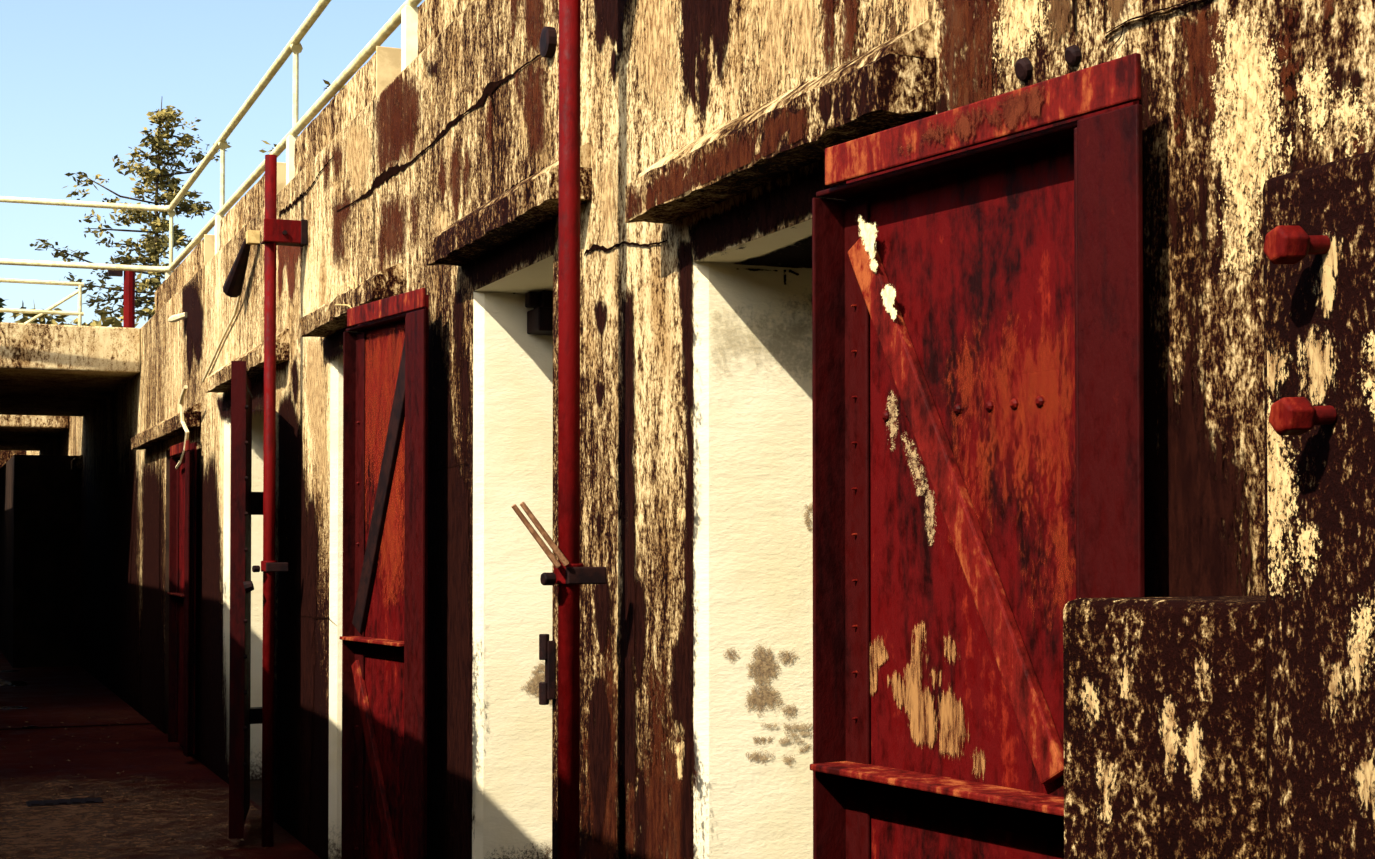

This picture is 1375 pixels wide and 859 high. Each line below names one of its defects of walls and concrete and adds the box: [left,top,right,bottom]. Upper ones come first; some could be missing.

water stain [594,0,629,85]
water stain [677,0,731,120]
water stain [822,0,864,72]
water stain [882,0,907,42]
water stain [912,0,1003,122]
crack [1072,0,1206,50]
crack [279,155,334,216]
water stain [374,56,437,272]
crack [337,54,541,264]
crack [584,240,667,257]
water stain [588,166,846,859]
mould [489,843,552,859]